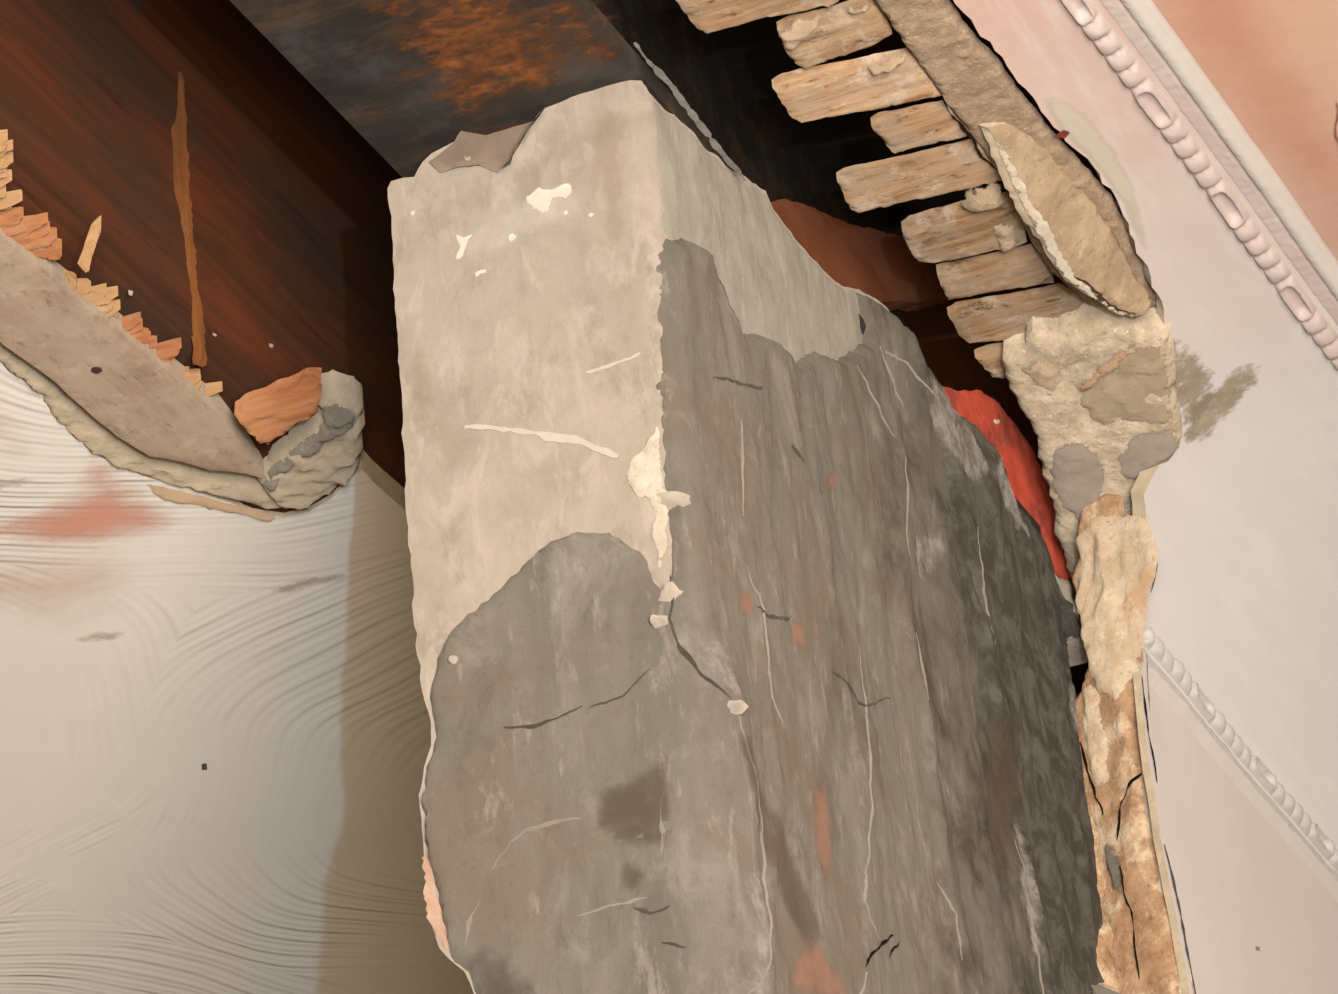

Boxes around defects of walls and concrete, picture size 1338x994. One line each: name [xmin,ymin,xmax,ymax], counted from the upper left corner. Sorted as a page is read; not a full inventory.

corrosion [401,0,569,100]
spalling [643,250,663,394]
spalling [0,342,365,521]
spalling [626,427,691,568]
spalling [875,0,1194,994]
crack [504,668,651,729]
spalling [649,581,683,629]
crack [669,575,731,698]
spalling [727,700,749,716]
crack [1080,654,1158,978]